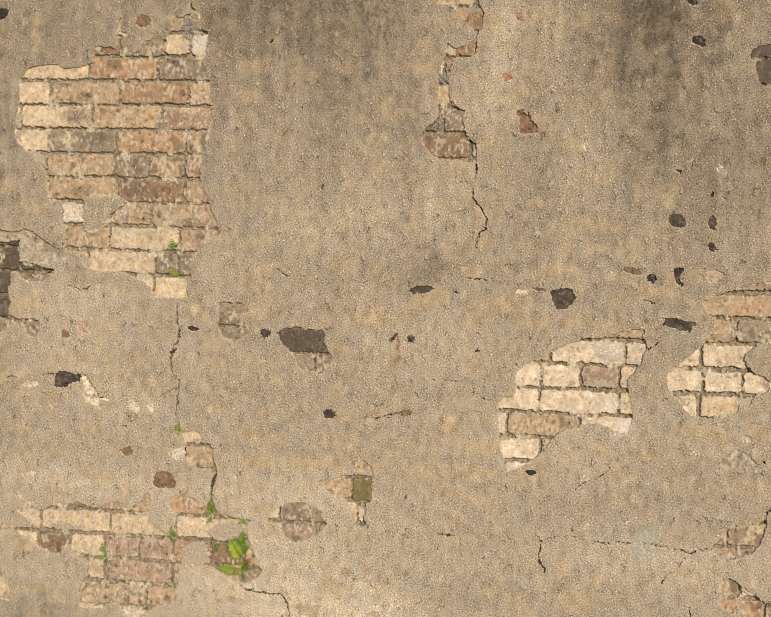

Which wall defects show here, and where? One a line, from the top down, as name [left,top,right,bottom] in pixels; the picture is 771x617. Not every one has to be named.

flaking render [420,0,485,179]
flaking render [750,44,771,87]
flaking render [0,6,221,339]
crack [469,138,488,251]
crack [169,303,181,429]
flaking render [259,326,333,375]
flaking render [496,329,648,476]
flaking render [662,281,771,420]
flaking render [0,471,263,617]
crack [209,471,217,490]
crack [240,584,290,616]
flaking render [267,502,327,544]